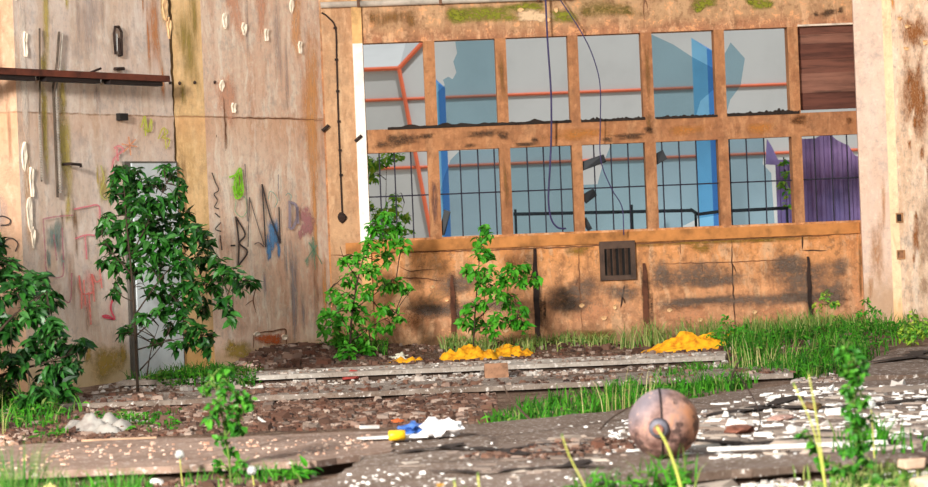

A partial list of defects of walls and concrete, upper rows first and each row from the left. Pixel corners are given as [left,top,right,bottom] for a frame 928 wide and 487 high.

rust [142,0,159,58]
leakage [511,3,589,21]
rust [903,59,927,136]